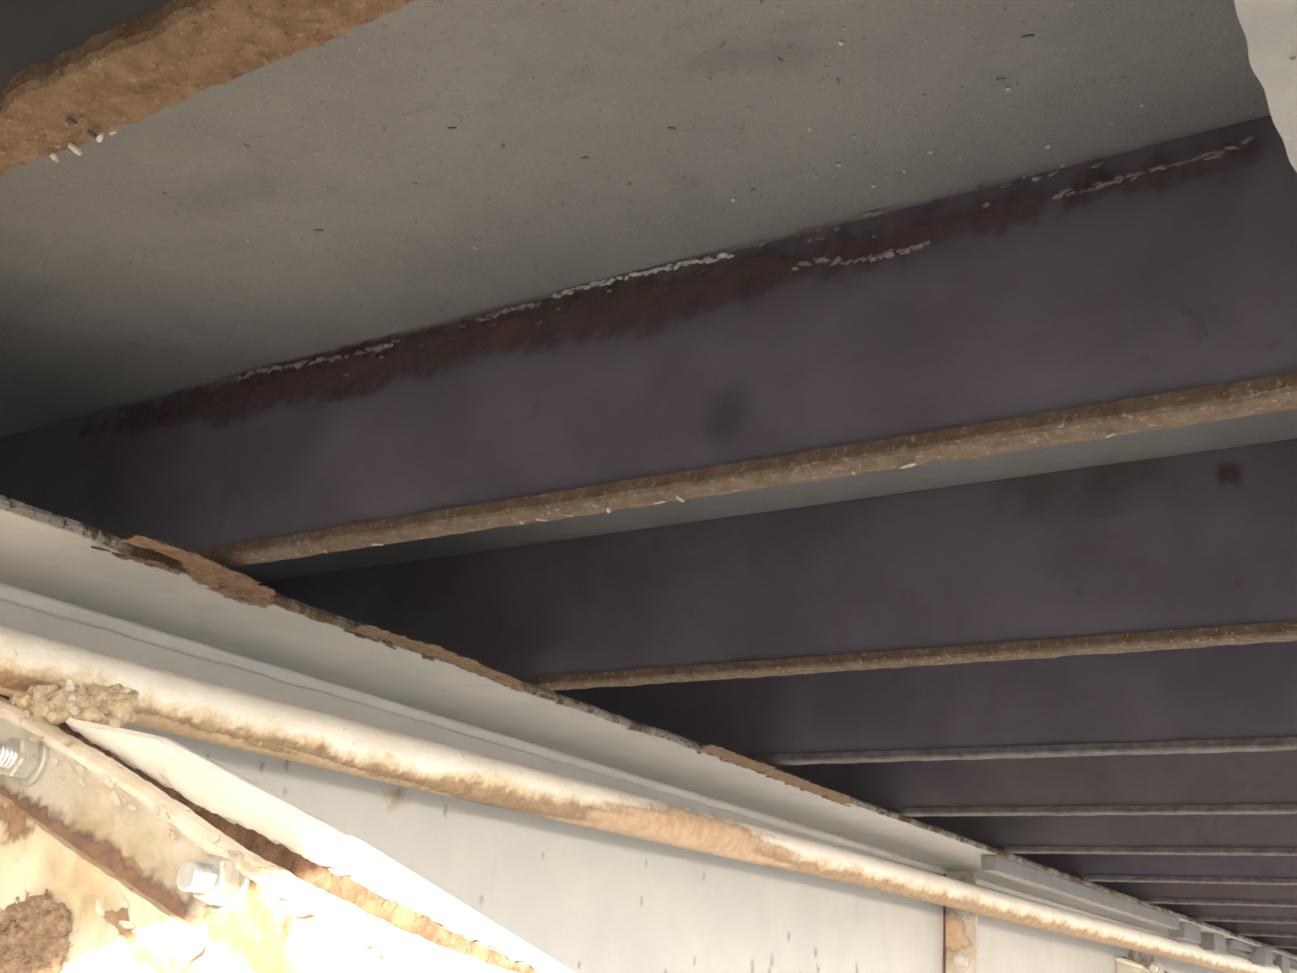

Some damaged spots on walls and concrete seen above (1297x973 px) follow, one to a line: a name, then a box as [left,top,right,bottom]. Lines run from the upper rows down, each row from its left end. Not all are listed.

corrosion [82,136,1258,435]
corrosion [91,535,277,608]
corrosion [344,625,526,692]
corrosion [697,744,854,807]
corrosion [0,679,536,973]
corrosion [516,803,796,868]
corrosion [943,906,971,973]